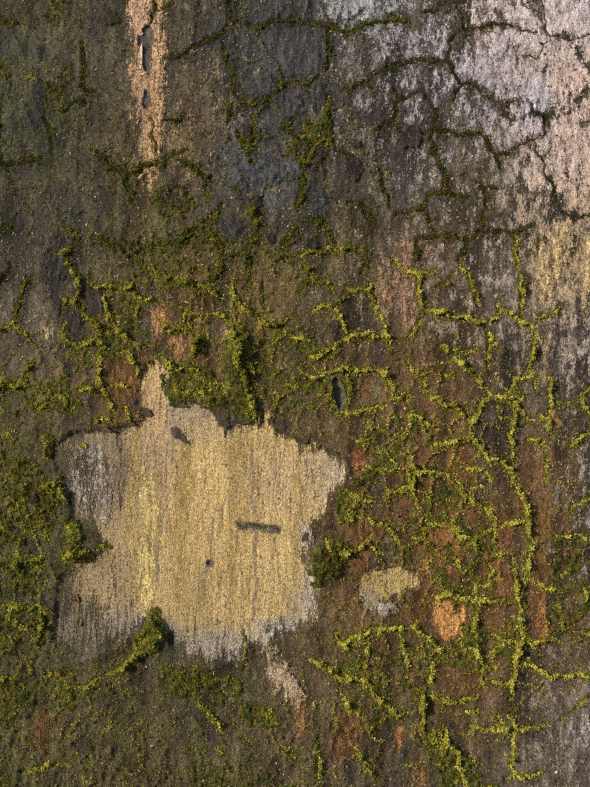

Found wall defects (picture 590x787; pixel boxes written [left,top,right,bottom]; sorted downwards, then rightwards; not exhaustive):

crack [147,0,174,26]
crack [167,0,412,167]
peeling [320,98,444,202]
peeling [396,31,496,221]
crack [342,0,590,121]
crack [49,95,439,448]
peeling [53,355,405,672]
peeling [354,551,423,611]